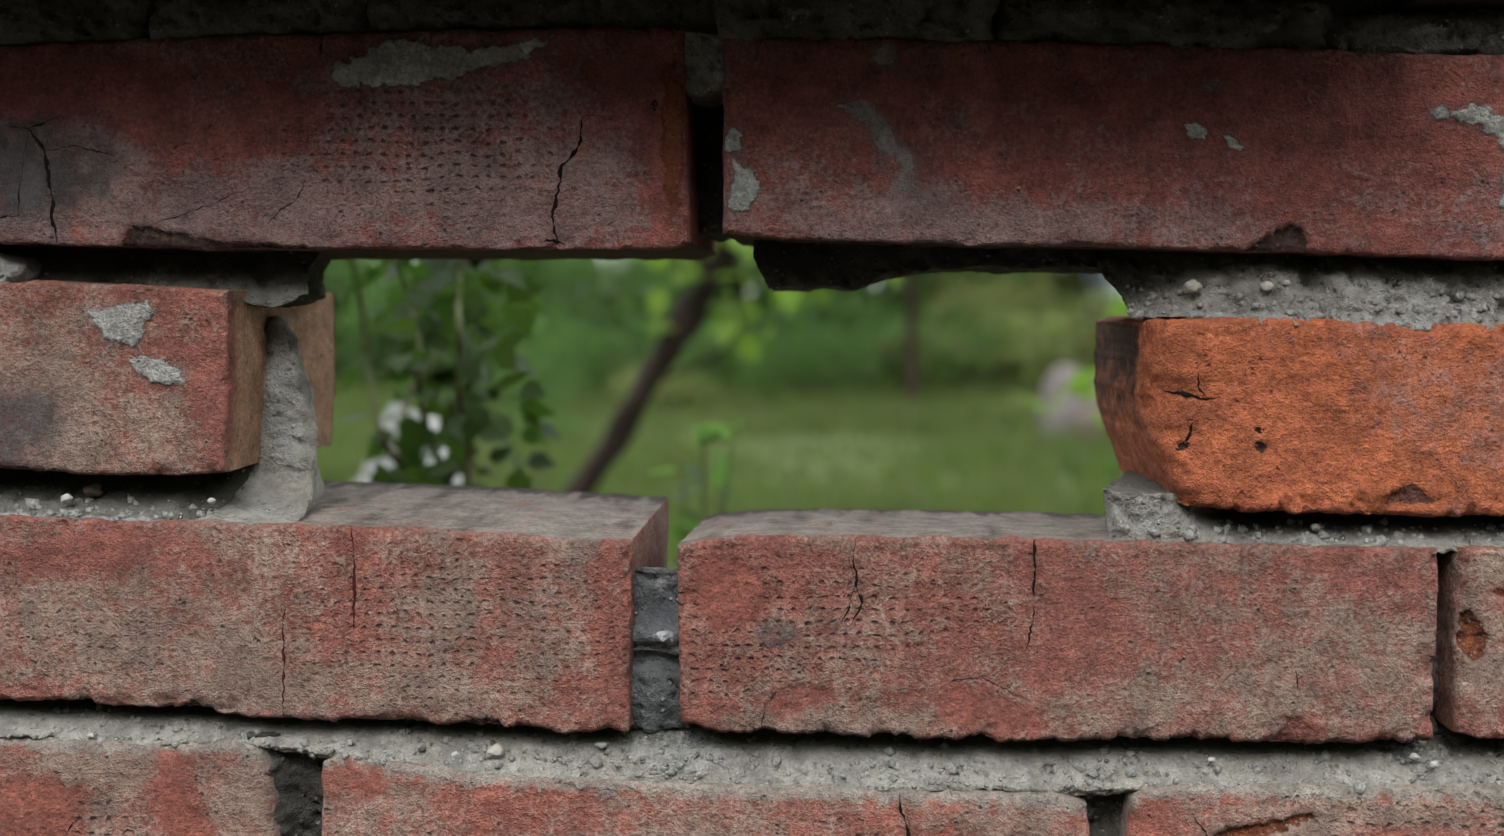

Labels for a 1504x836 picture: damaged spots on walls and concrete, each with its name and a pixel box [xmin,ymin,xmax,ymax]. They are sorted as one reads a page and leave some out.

crack [0,116,111,243]
crack [541,115,611,245]
crack [349,525,357,628]
crack [842,537,863,624]
crack [1025,540,1037,651]
spalling [1456,610,1488,661]
crack [899,797,911,836]
spalling [1214,813,1317,836]